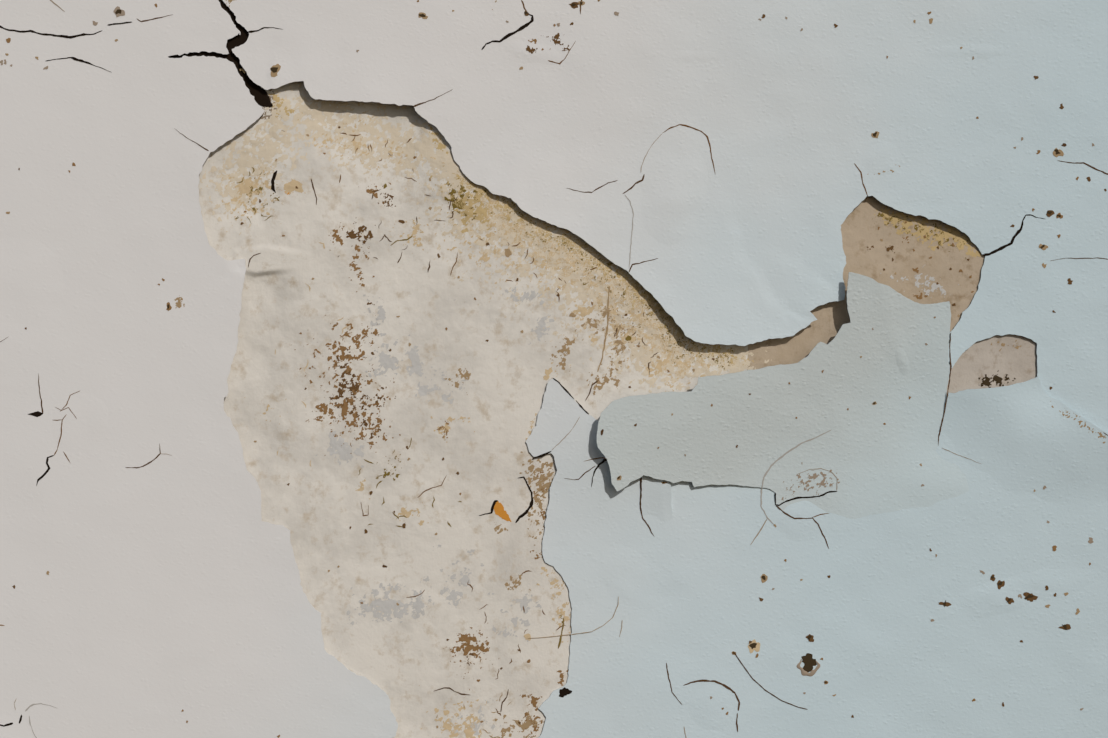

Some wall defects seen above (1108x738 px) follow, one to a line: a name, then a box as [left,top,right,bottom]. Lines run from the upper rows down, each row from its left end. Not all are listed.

crack [0,0,169,72]
crack [168,0,283,131]
crack [482,0,534,50]
crack [341,133,412,161]
crack [983,214,1044,256]
crack [359,124,715,527]
crack [36,374,79,486]
spalling [198,64,1108,738]
crack [639,477,654,536]
crack [0,700,56,738]